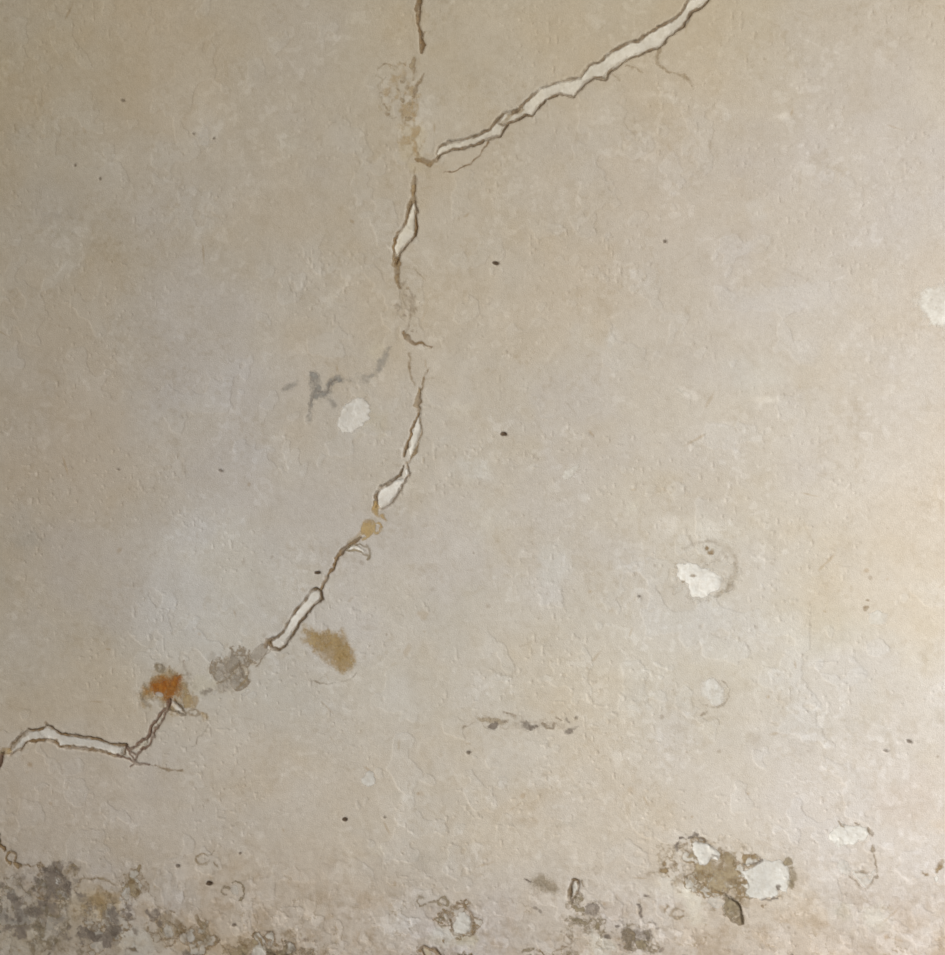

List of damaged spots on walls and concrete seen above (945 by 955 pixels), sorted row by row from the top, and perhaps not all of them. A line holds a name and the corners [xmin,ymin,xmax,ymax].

crack [392,0,709,288]
spalling [338,398,370,433]
crack [267,331,432,651]
spalling [676,562,721,598]
corrosion [143,664,193,708]
crack [0,699,184,767]
leakage [0,862,142,954]
peeling [222,931,296,955]
peeling [417,896,480,940]
peeling [660,833,795,926]